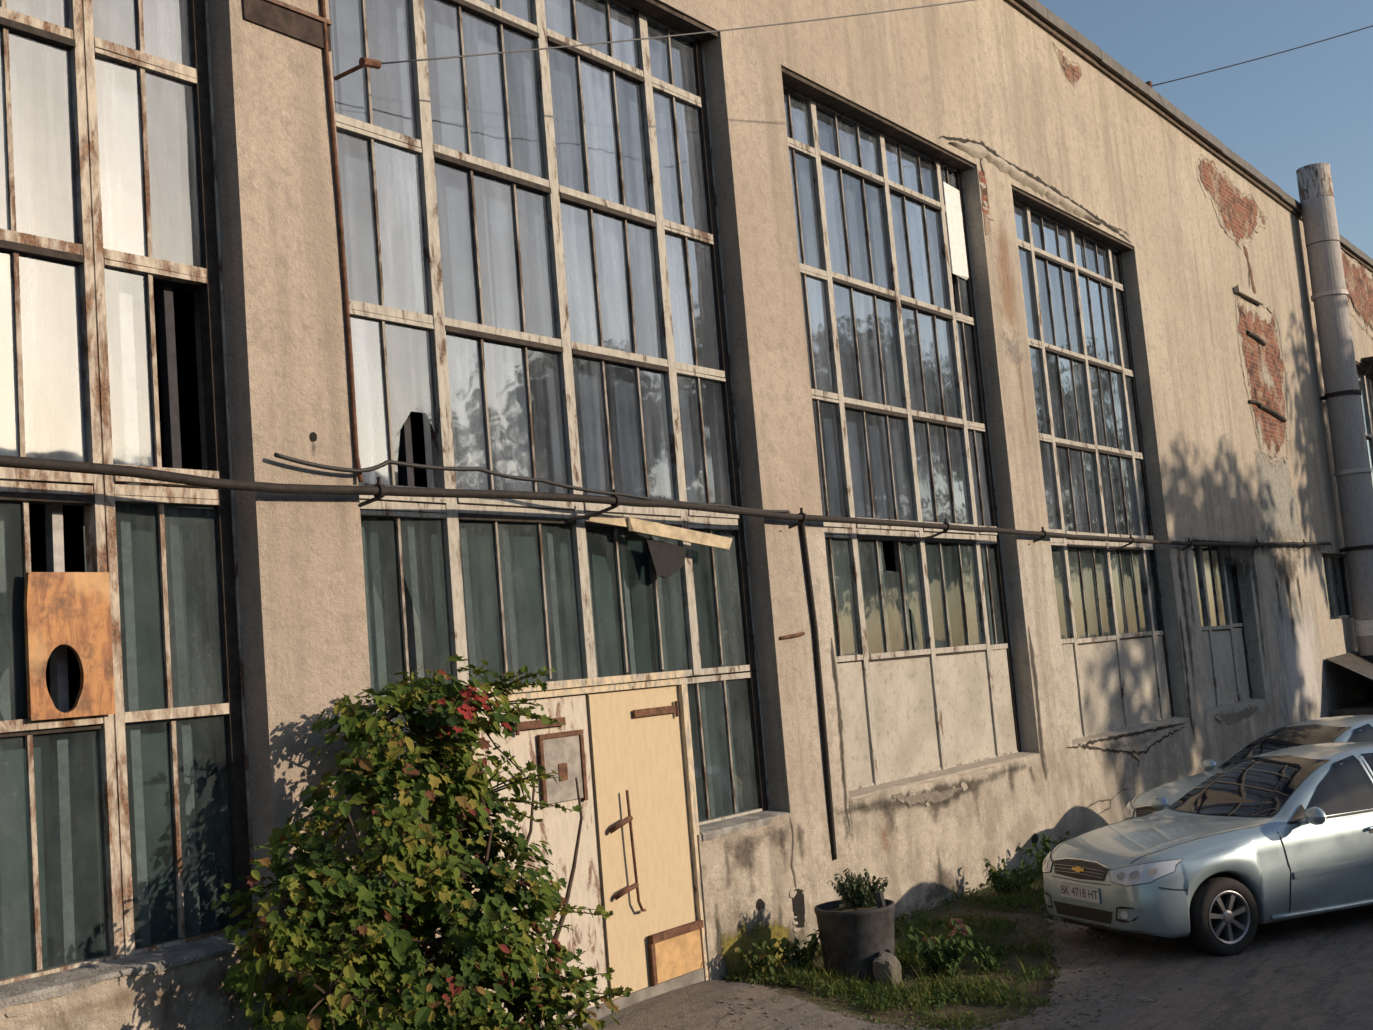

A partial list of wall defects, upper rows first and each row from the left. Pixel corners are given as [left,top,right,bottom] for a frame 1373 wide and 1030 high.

flaking render [978,170,994,235]
flaking render [1196,153,1268,249]
flaking render [1341,249,1373,340]
flaking render [1233,285,1290,464]
crack [1067,722,1187,815]